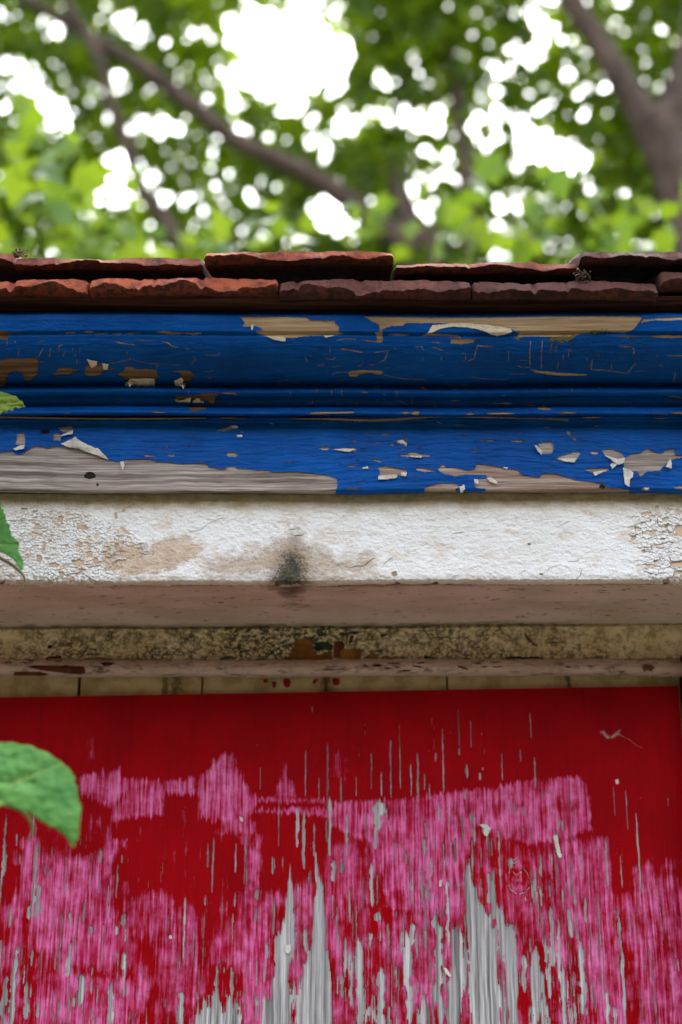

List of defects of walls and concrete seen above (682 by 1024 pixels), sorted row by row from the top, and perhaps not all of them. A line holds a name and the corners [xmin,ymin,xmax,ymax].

peeling [240,316,343,341]
peeling [364,316,682,348]
leakage [209,536,368,594]
peeling [0,358,682,583]
peeling [0,814,147,1024]
peeling [153,709,679,1024]